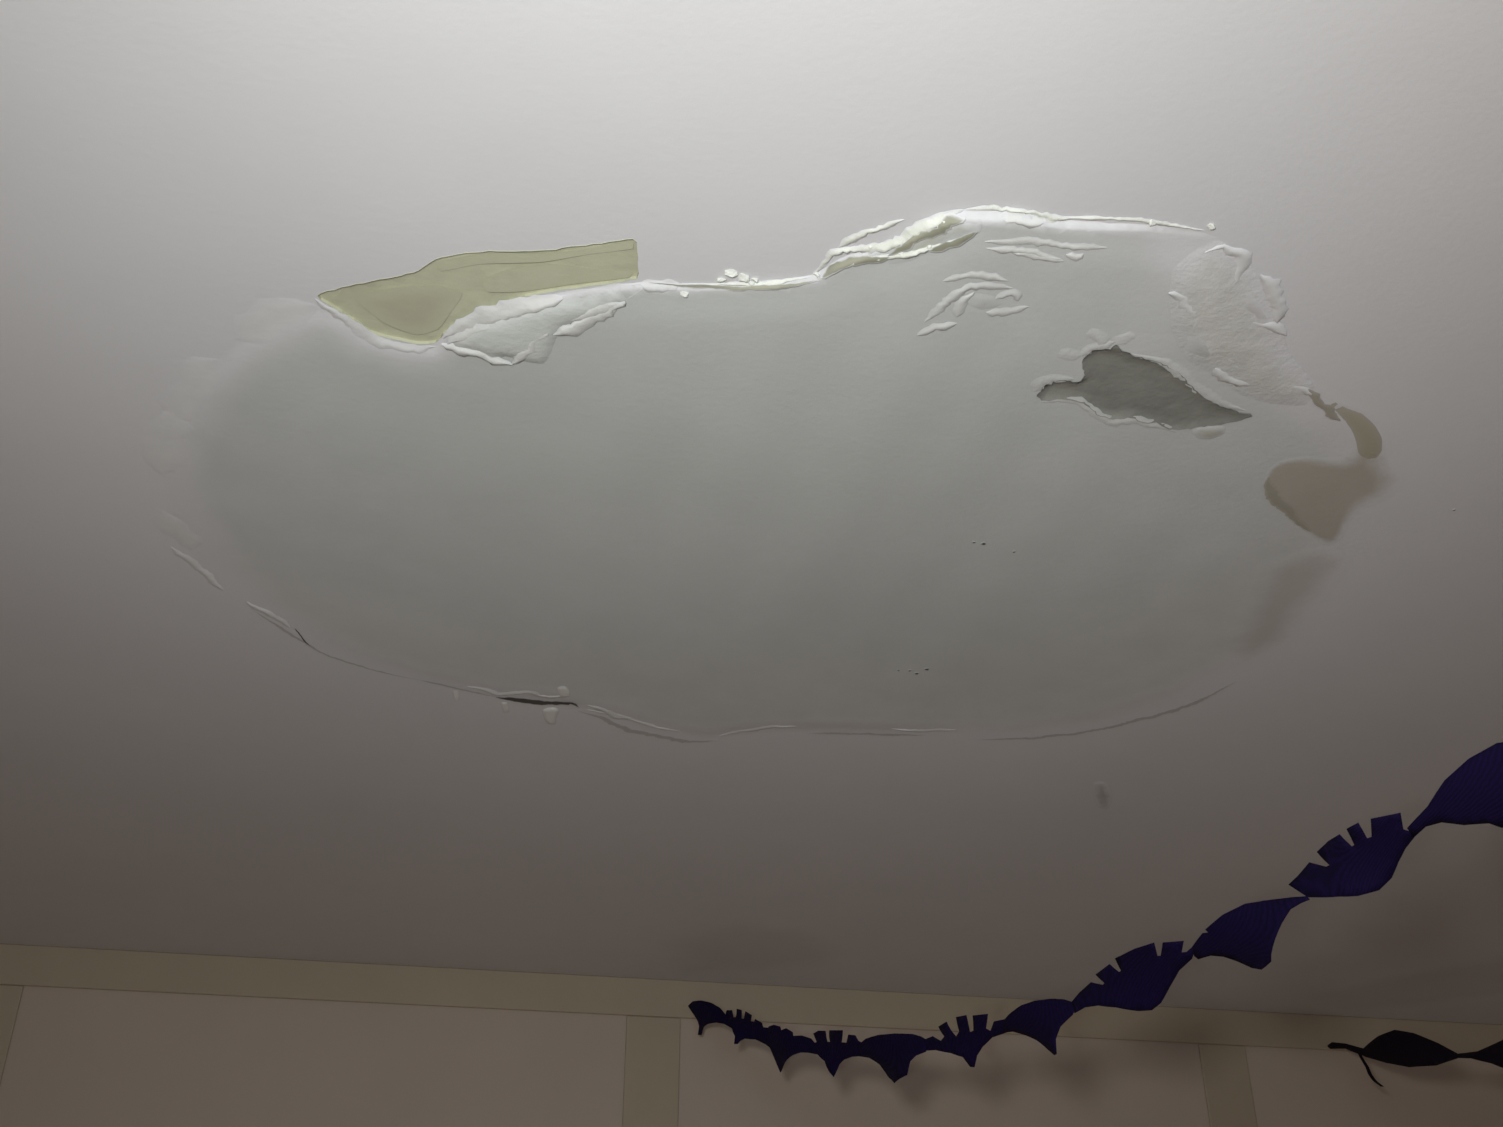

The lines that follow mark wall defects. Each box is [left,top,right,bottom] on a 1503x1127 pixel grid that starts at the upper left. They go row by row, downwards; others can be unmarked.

peeling [315,239,680,365]
peeling [719,269,758,285]
spalling [1030,328,1252,439]
damp [1218,380,1404,667]
crack [171,547,1239,743]